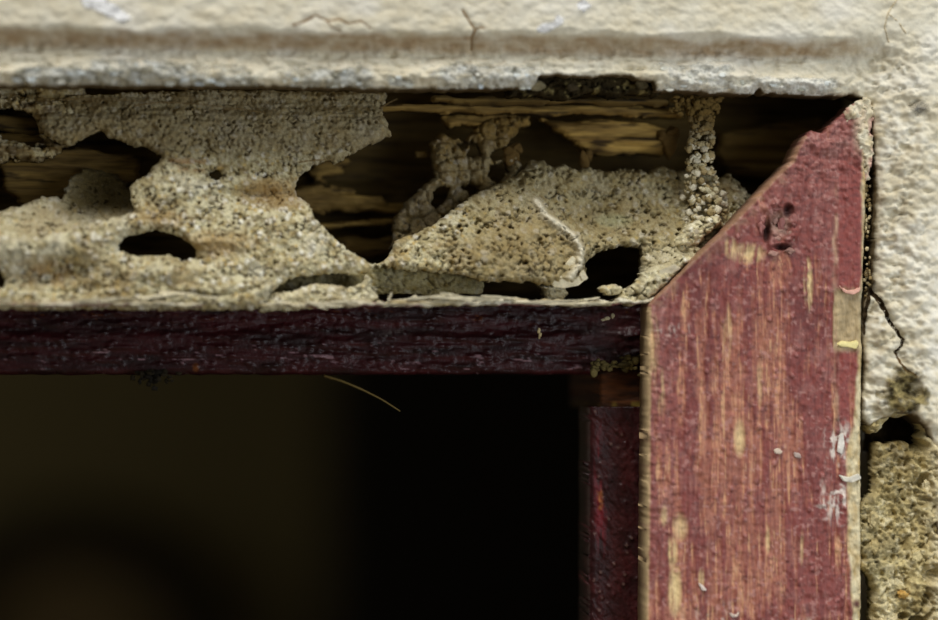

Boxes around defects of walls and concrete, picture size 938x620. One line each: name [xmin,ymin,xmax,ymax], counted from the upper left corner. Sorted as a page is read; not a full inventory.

peeling [282,69,371,88]
peeling [390,75,413,88]
crack [862,181,918,377]
flaking render [839,413,938,620]